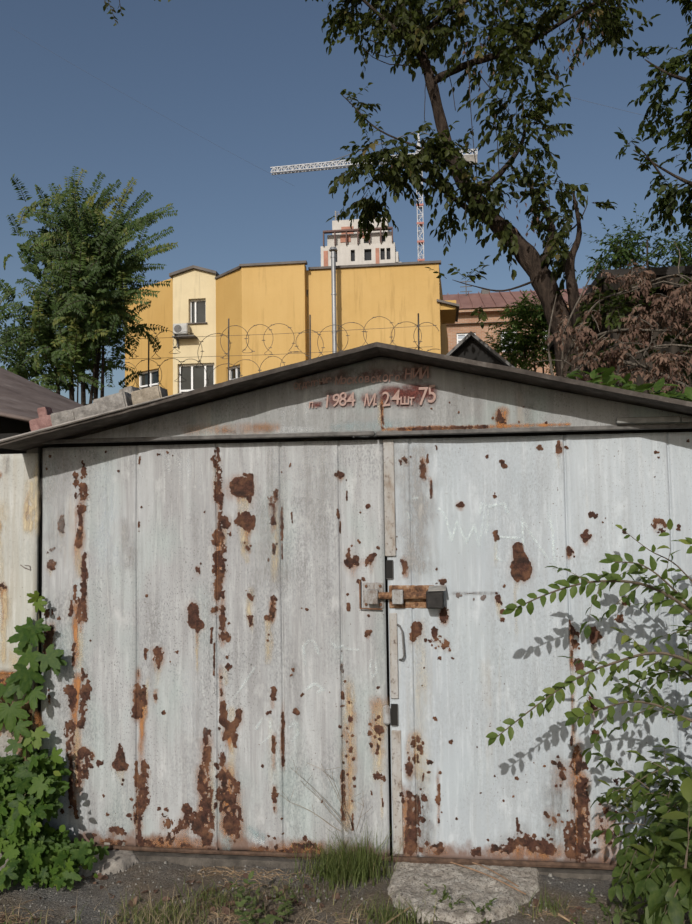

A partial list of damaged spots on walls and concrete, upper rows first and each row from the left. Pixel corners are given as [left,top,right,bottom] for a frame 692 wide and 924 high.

rust [380,400,570,431]
rust [0,582,17,674]
rust [43,447,256,850]
rust [246,590,278,653]
rust [344,539,380,584]
rust [409,607,455,660]
rust [495,542,532,622]
rust [569,619,602,674]
rust [266,686,285,767]
rust [367,703,386,782]
rust [370,735,445,856]
rust [470,736,622,863]